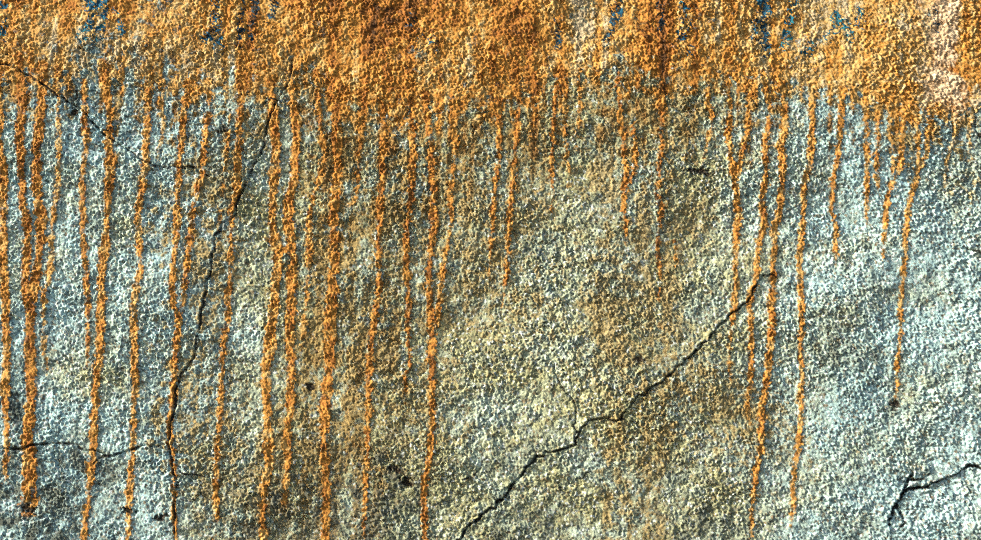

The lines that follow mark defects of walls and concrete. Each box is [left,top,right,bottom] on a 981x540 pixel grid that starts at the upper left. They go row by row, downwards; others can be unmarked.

corrosion [50,137,63,231]
corrosion [78,75,94,356]
corrosion [123,262,144,540]
crack [0,54,293,533]
corrosion [179,110,226,306]
corrosion [211,232,235,520]
corrosion [257,236,298,540]
crack [461,274,777,538]
corrosion [723,112,744,327]
corrosion [862,141,880,225]
corrosion [881,176,896,244]
crack [888,464,981,528]